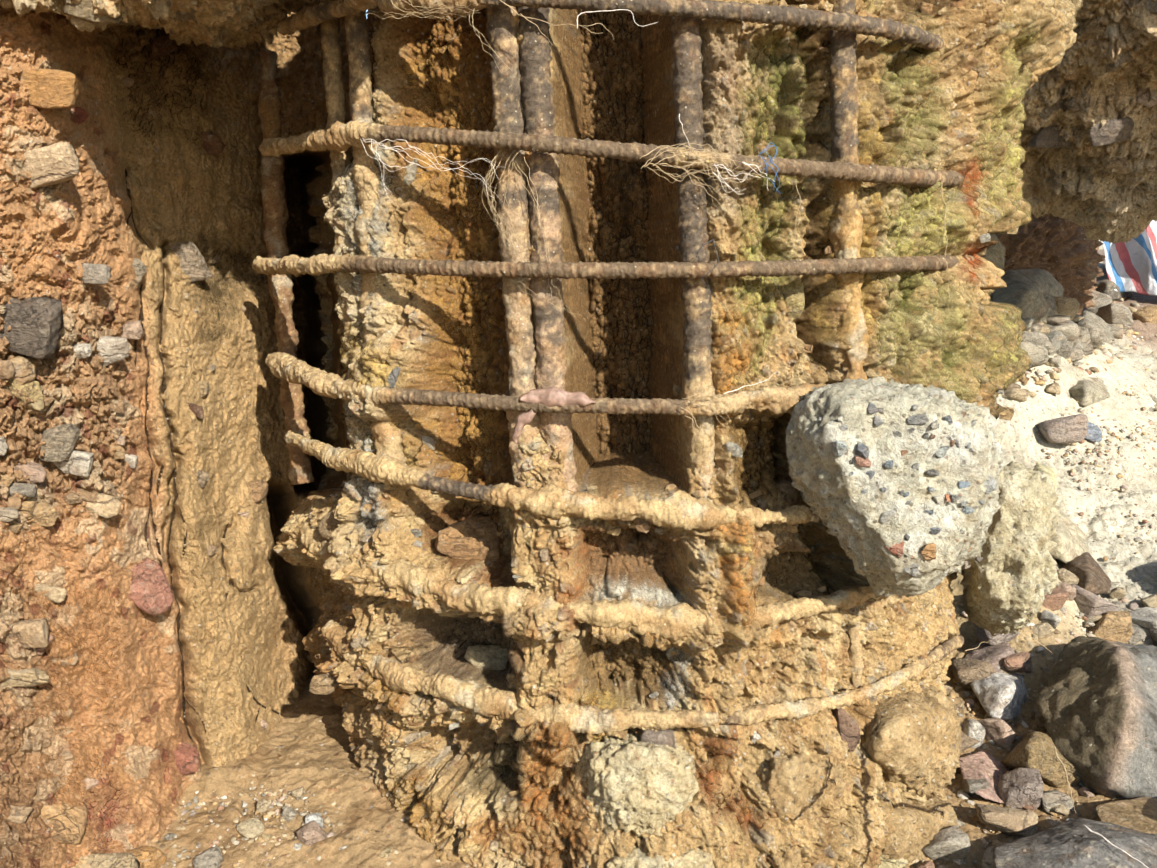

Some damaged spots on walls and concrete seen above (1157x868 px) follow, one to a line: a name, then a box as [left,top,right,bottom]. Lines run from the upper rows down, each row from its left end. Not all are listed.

rust [371,23,495,131]
spalling [554,8,672,146]
rust [395,142,502,262]
spalling [558,153,680,263]
leakage [770,203,791,261]
spalling [803,178,835,260]
rust [422,275,500,394]
spalling [563,277,681,400]
leakage [889,272,938,337]
rust [387,406,506,483]
spalling [572,413,681,491]
crack [794,746,951,868]